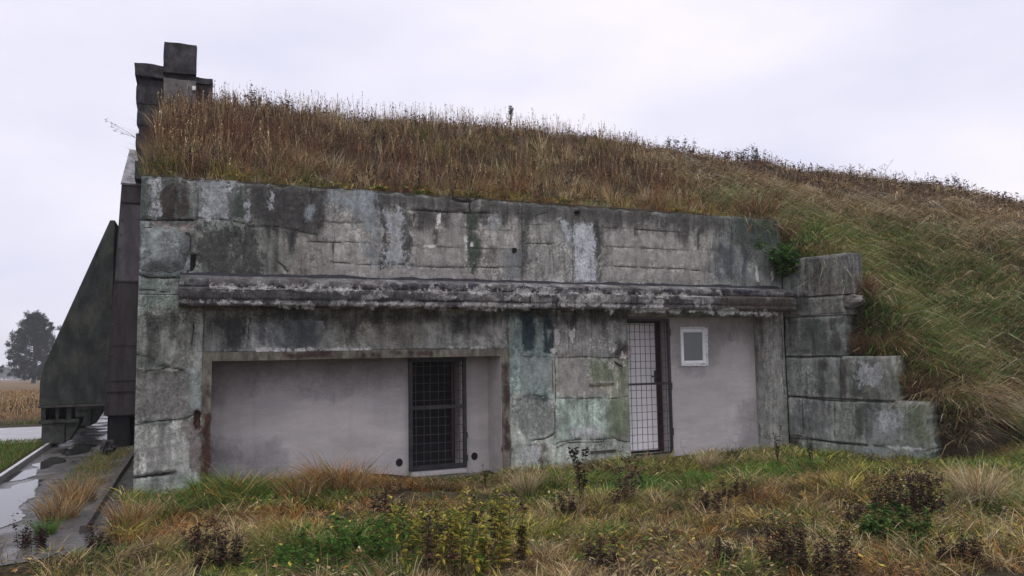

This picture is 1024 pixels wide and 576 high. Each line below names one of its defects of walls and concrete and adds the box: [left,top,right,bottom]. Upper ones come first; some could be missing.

leakage [156,179,325,275]
leakage [375,191,724,292]
peeling [182,188,782,448]
leakage [521,311,628,353]
rust [199,414,213,483]